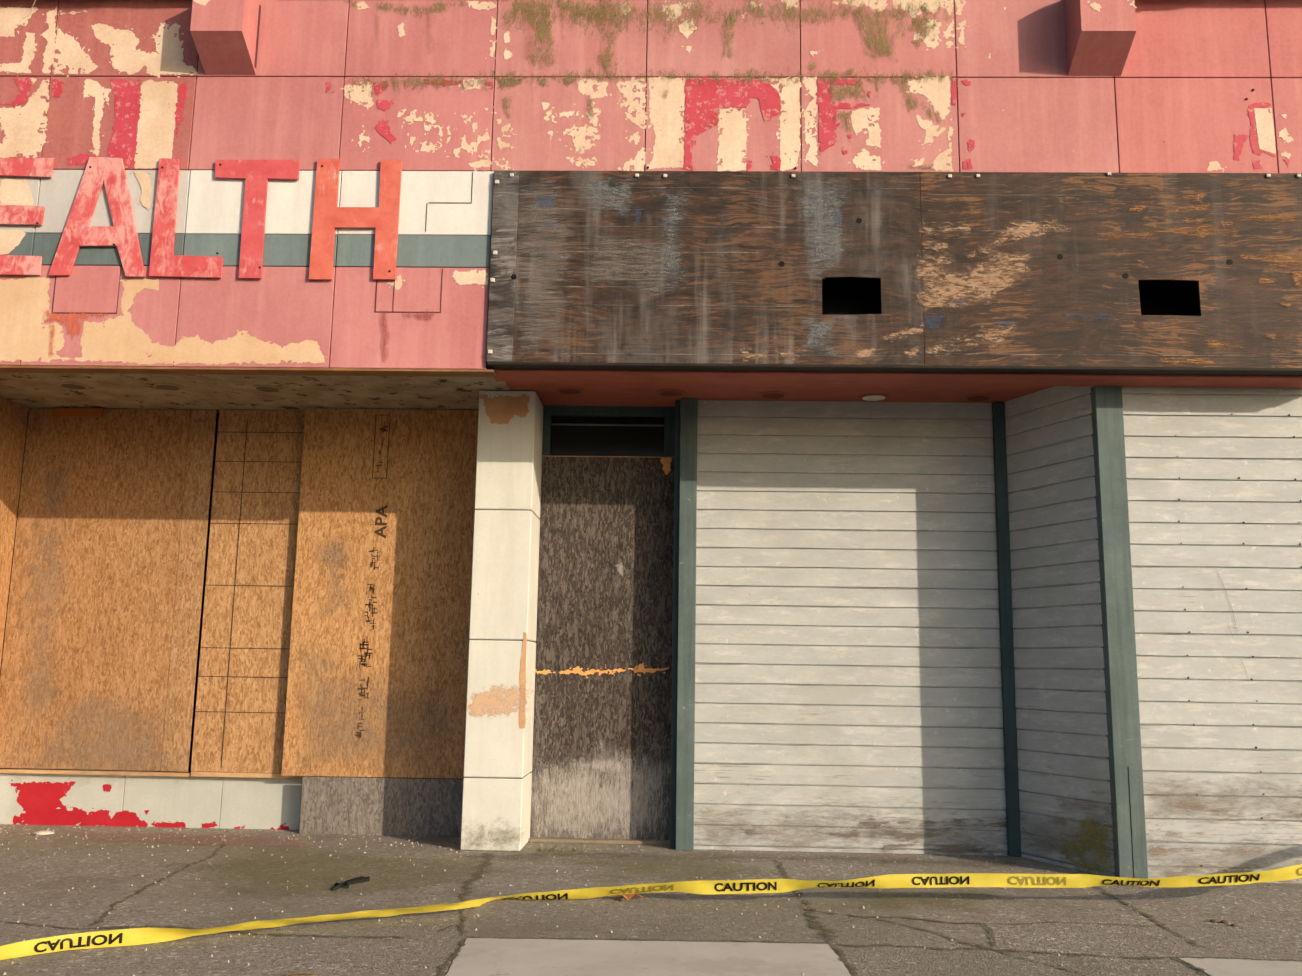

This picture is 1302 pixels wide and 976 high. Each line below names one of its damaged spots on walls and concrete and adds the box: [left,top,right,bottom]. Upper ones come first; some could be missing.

peeling [0,6,198,214]
water stain [353,0,953,130]
peeling [542,76,885,172]
peeling [904,76,975,172]
peeling [1207,101,1294,172]
peeling [0,229,26,255]
peeling [0,276,327,367]
peeling [855,222,1068,358]
peeling [479,393,529,424]
peeling [468,632,669,729]
peeling [9,778,186,828]